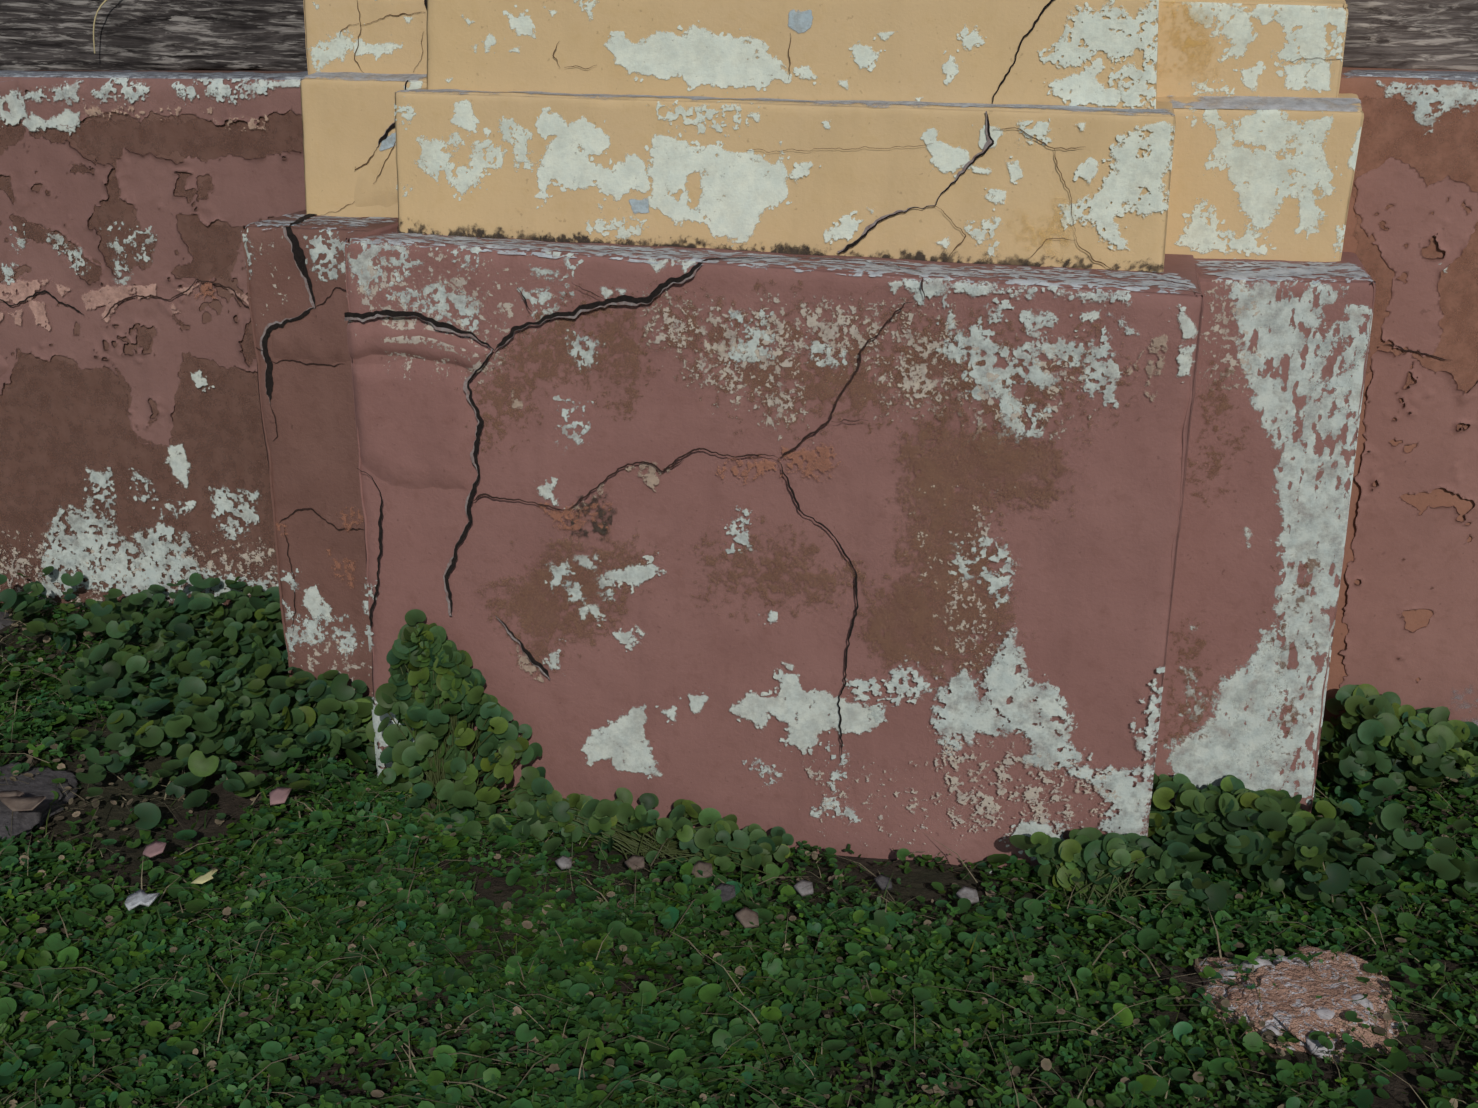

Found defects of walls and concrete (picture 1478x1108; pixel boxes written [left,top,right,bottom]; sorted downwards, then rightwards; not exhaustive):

crack [0,0,1111,754]
peeling [0,0,1478,878]